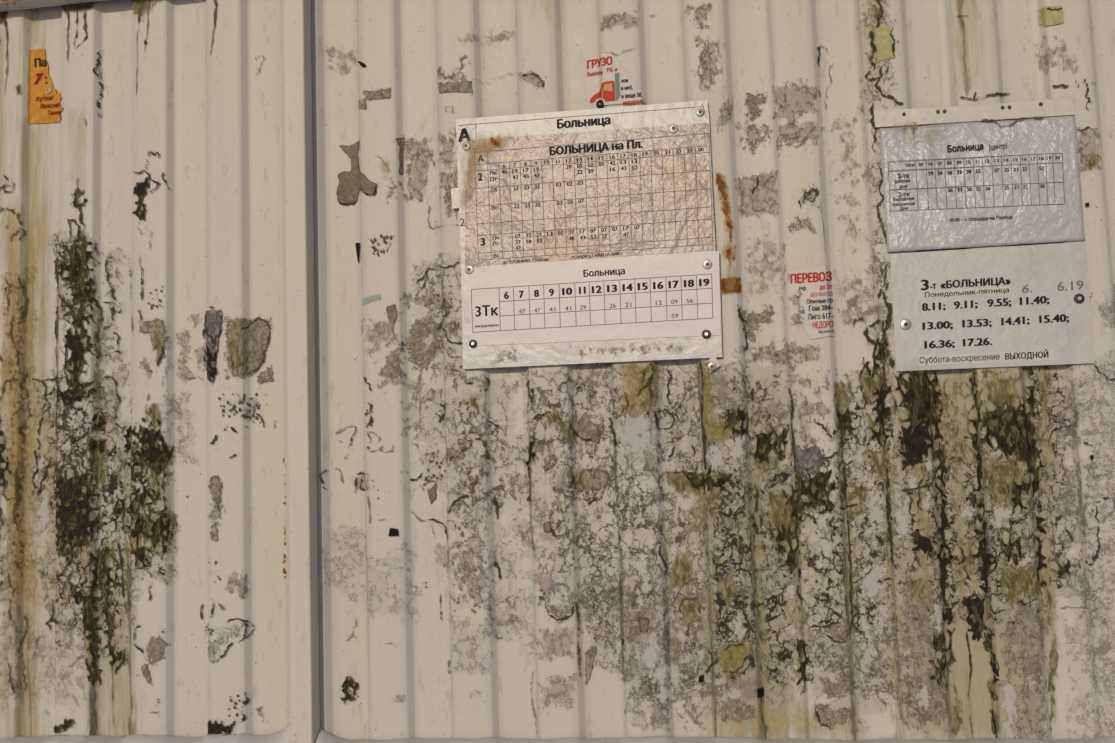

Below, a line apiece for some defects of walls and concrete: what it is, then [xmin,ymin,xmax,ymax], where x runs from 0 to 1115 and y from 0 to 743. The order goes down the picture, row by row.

peeling [336,127,459,229]
peeling [437,55,549,112]
rust [716,173,741,294]
rust [0,239,37,719]
damp [92,303,102,423]
peeling [139,306,276,464]
peeling [340,676,361,708]
peeling [354,286,446,503]
peeling [525,438,705,735]
damp [929,373,963,736]
damp [968,371,1000,738]
damp [1026,367,1059,732]